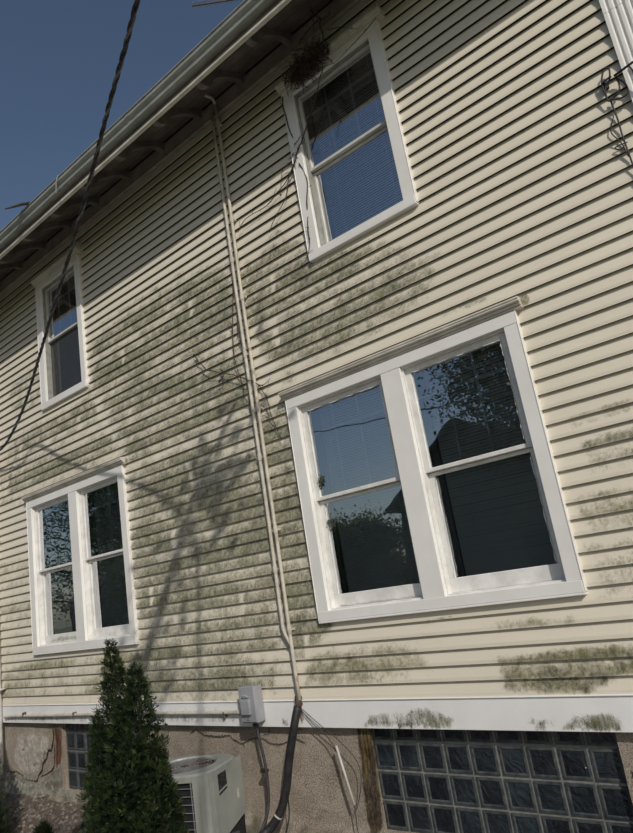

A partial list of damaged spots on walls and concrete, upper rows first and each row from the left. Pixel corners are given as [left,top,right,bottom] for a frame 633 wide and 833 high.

water stain [241,242,431,359]
water stain [1,268,249,492]
water stain [100,442,332,692]
crack [10,727,55,799]
crack [189,728,306,747]
water stain [357,709,451,833]
water stain [503,645,633,693]
water stain [566,714,621,731]